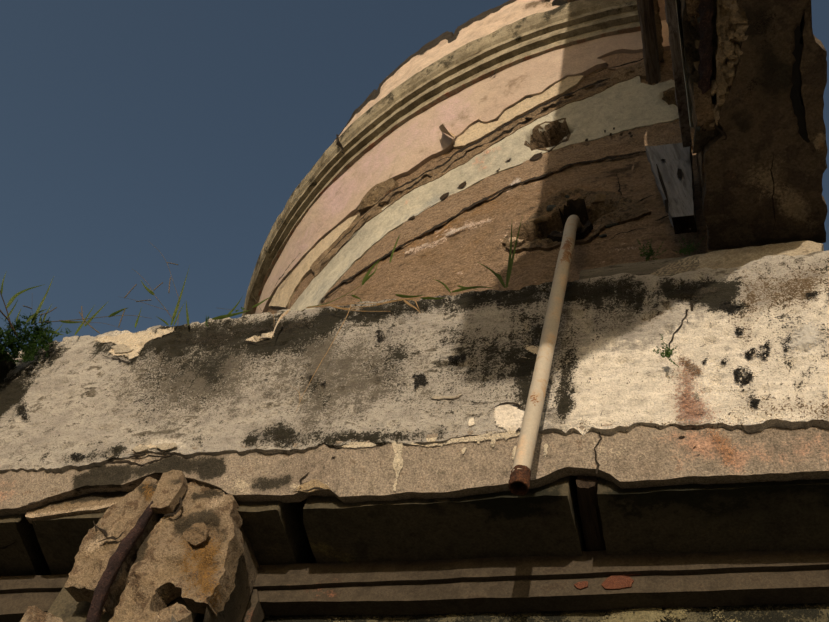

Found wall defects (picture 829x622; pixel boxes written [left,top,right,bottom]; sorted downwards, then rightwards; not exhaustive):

spalling [653,0,664,62]
spalling [269,58,651,309]
water stain [177,319,316,349]
water stain [572,280,741,315]
crack [669,294,695,349]
corrosion [671,354,704,415]
water stain [733,336,771,385]
water stain [392,430,520,491]
peeling [492,402,525,431]
crack [594,412,602,473]
peeling [149,470,188,514]
spalling [183,522,210,547]